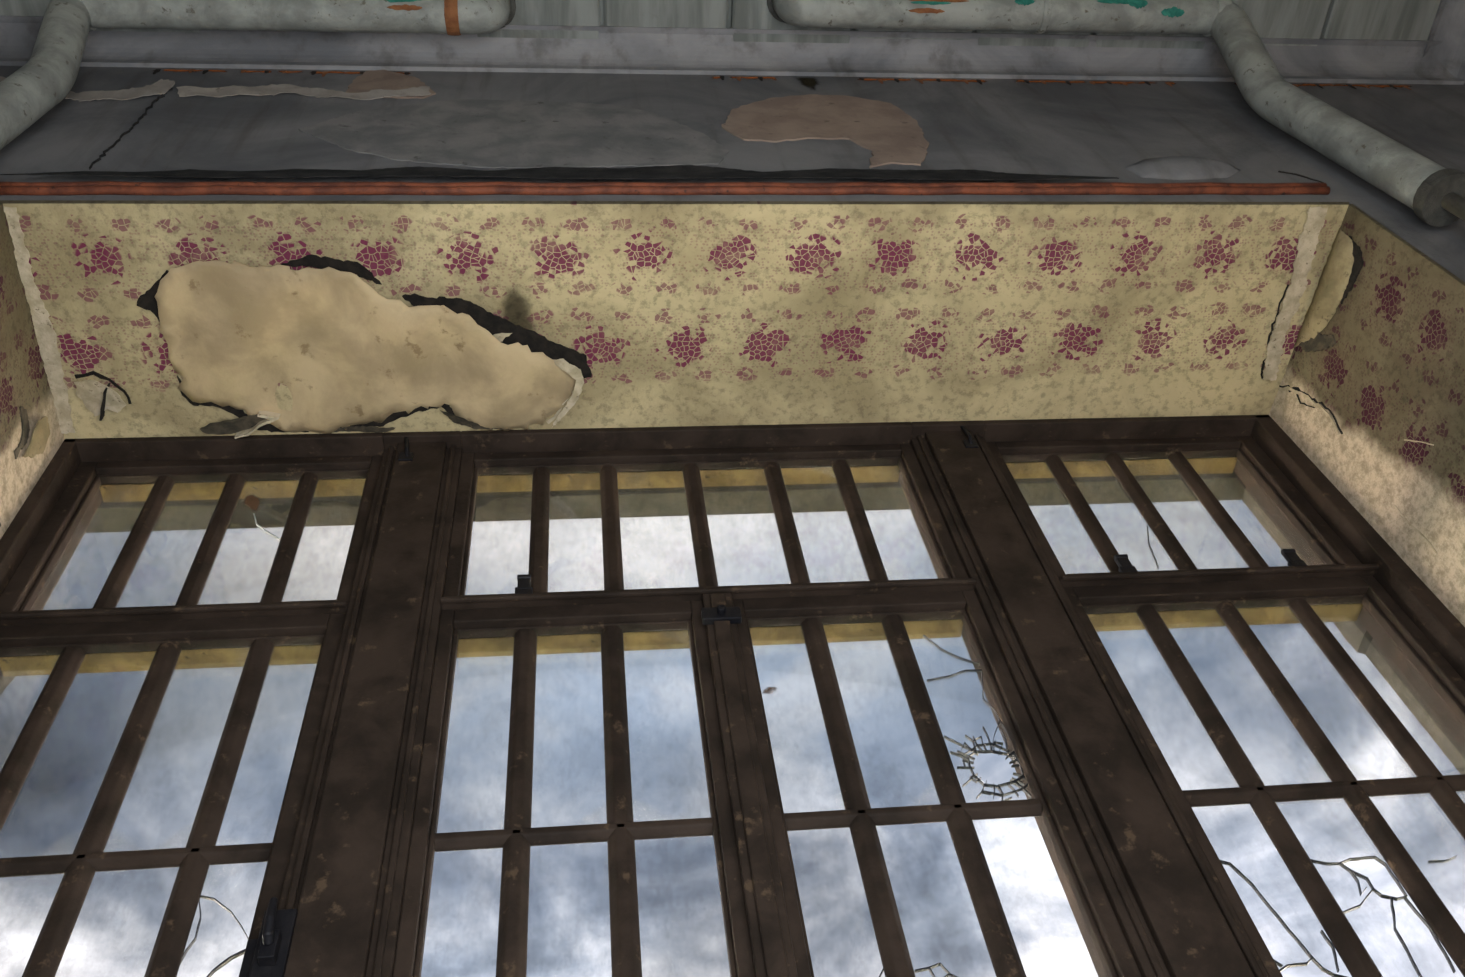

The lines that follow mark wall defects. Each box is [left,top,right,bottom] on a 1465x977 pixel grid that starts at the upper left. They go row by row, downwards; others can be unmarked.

peeling [440,410,512,430]
peeling [552,359,584,427]